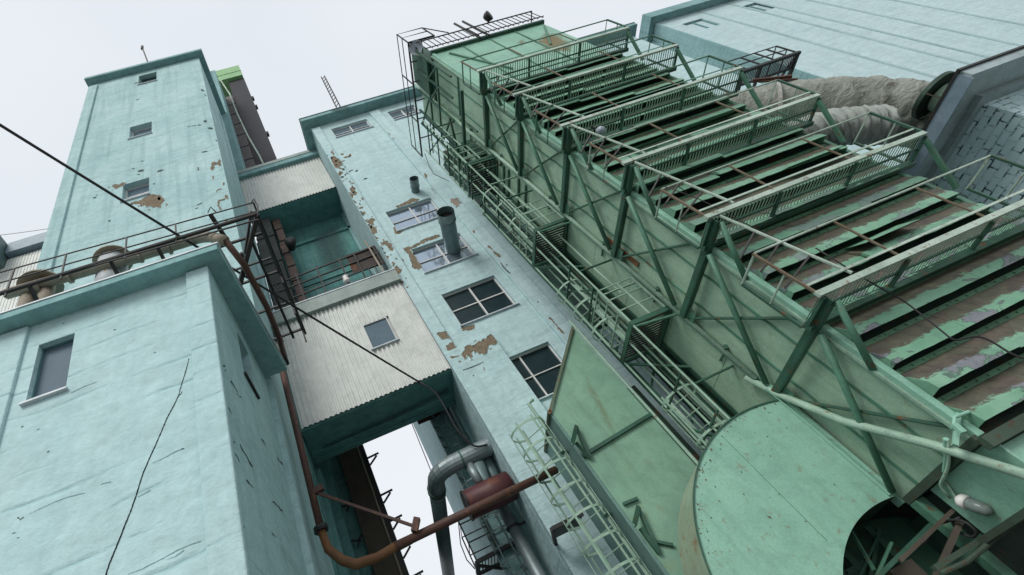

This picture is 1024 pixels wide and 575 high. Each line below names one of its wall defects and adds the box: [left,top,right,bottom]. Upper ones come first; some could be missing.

peeling [131,169,168,210]
flaking render [197,151,229,221]
flaking render [327,149,440,288]
flaking render [436,324,498,370]
crack [105,359,201,575]